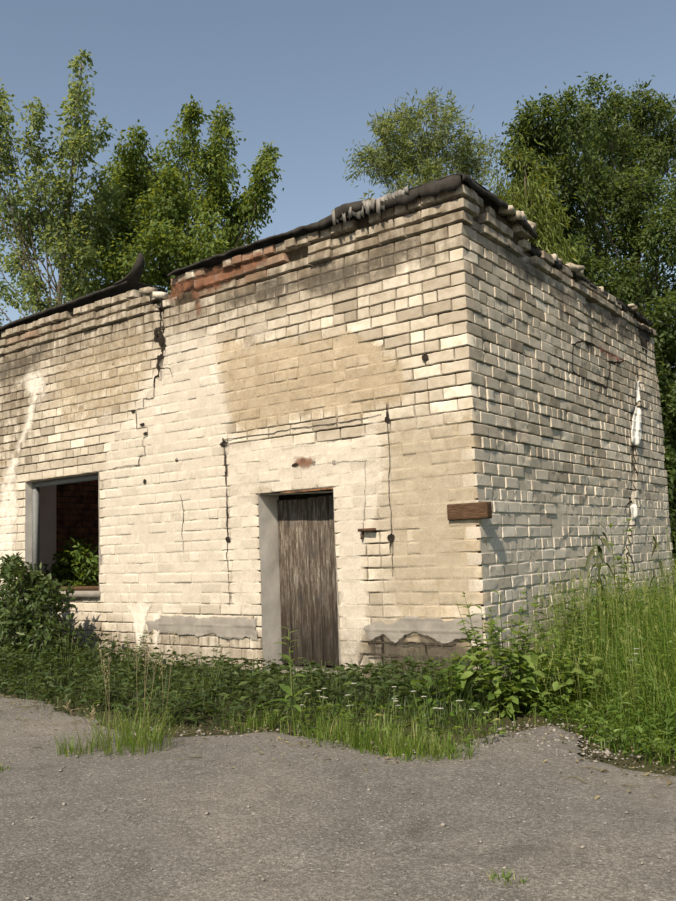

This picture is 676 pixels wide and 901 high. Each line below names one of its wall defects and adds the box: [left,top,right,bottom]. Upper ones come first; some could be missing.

damp [303,252,392,294]
damp [0,348,45,567]
crack [113,297,172,484]
peeling [230,444,483,679]